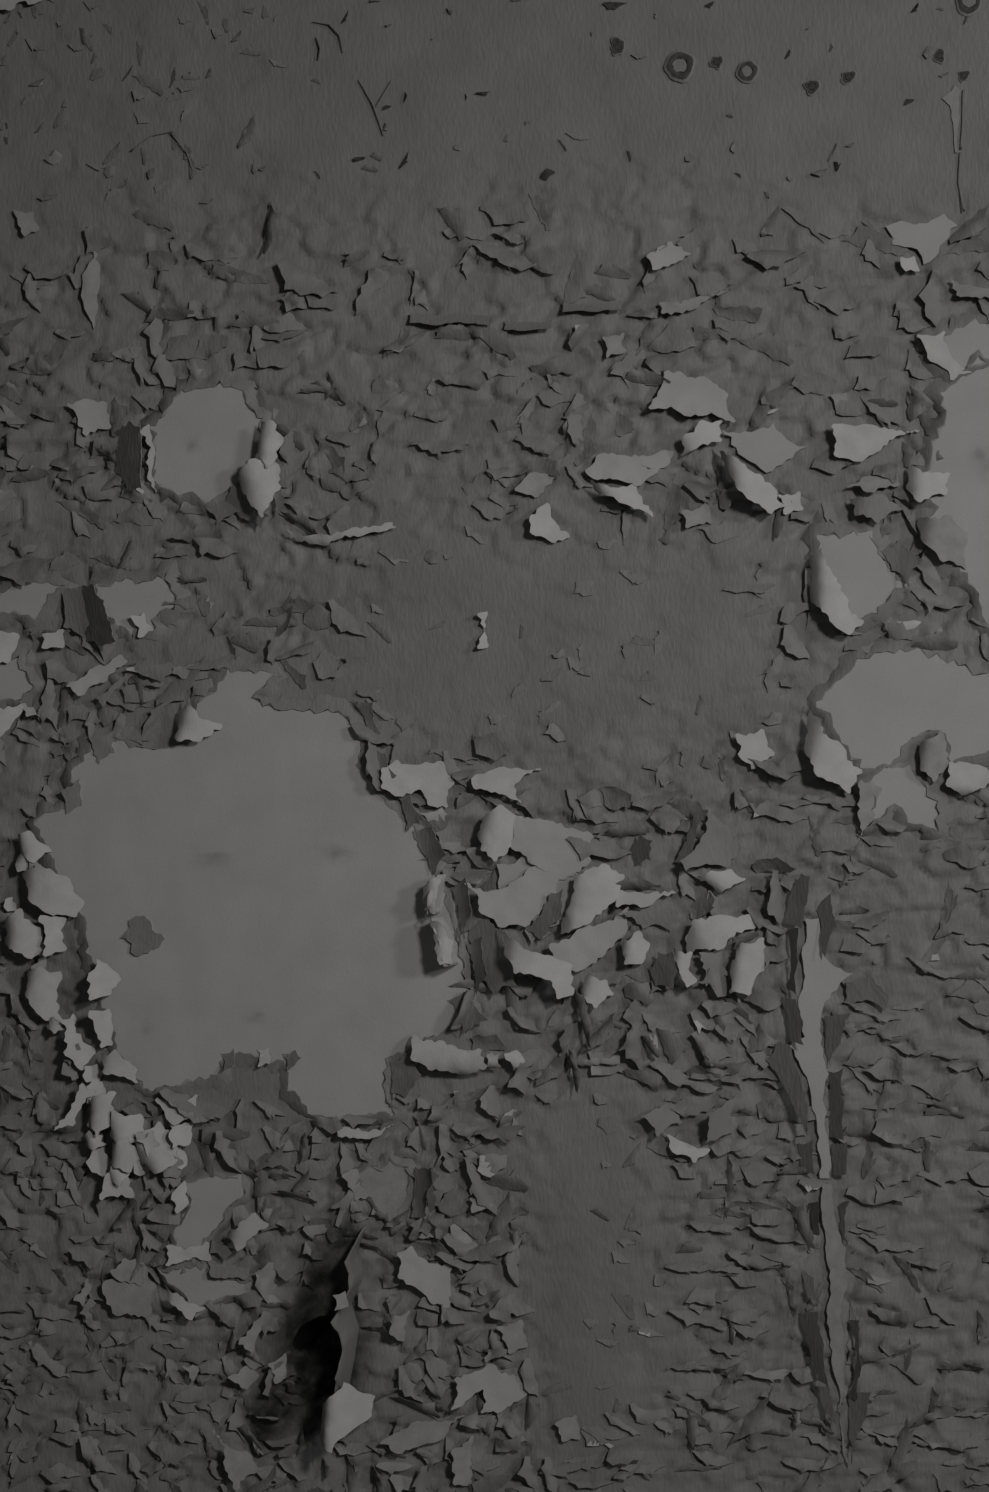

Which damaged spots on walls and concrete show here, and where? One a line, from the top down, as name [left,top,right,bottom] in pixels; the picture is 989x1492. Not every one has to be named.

peeling [0,0,43,11]
spalling [603,2,626,10]
spalling [540,168,555,180]
peeling [0,194,807,1492]
crack [539,790,989,1492]
damp [254,1261,358,1439]